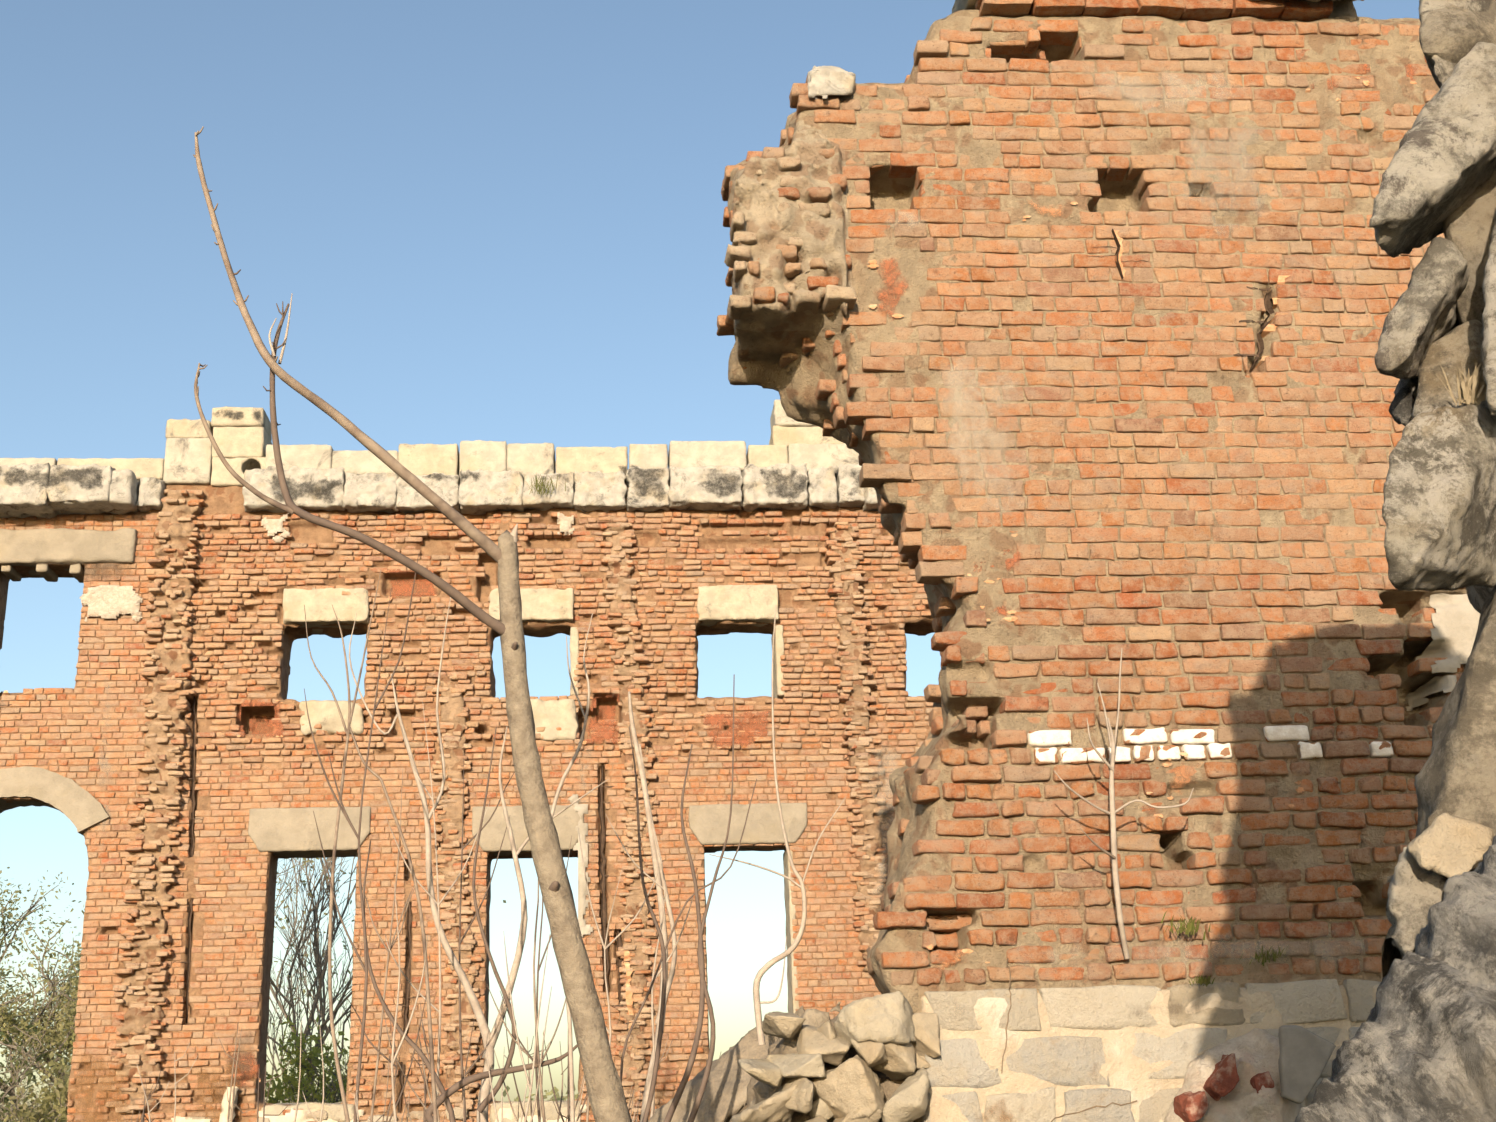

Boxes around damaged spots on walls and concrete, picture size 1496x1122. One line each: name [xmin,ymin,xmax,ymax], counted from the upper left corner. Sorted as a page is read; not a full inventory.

crack [1092,229,1148,279]
crack [1234,275,1291,372]
crack [174,696,203,857]
crack [173,899,193,1024]
spalling [927,944,990,970]